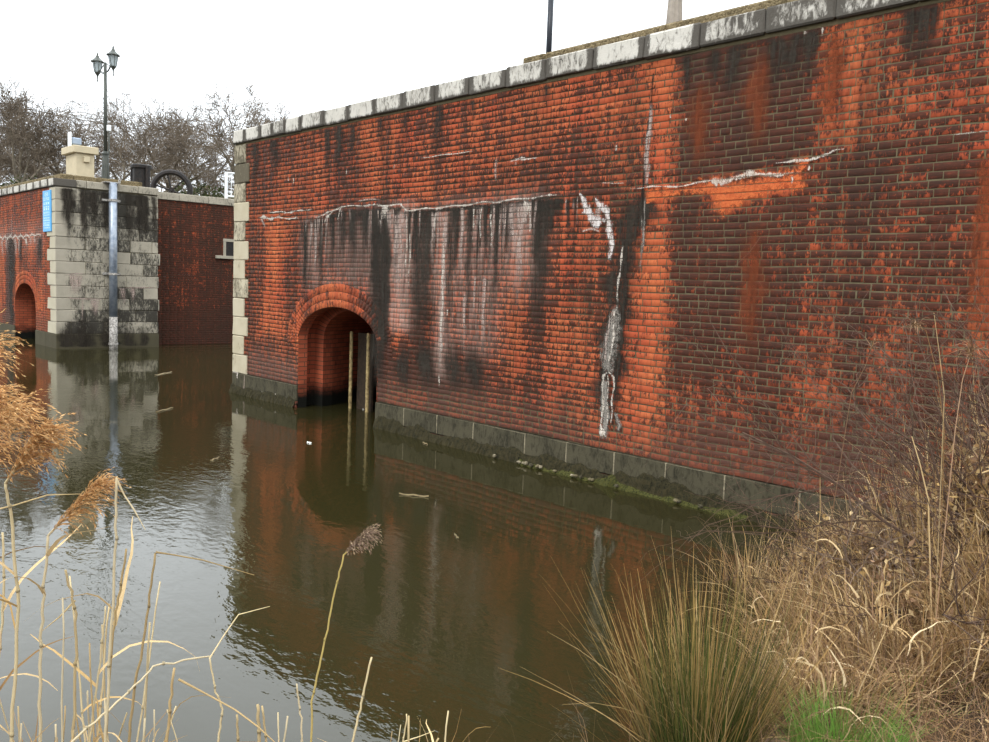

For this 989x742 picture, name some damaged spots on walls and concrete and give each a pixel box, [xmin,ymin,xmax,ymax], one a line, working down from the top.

water stain [62,188,109,237]
water stain [125,195,156,232]
water stain [59,273,109,347]
water stain [301,193,657,424]